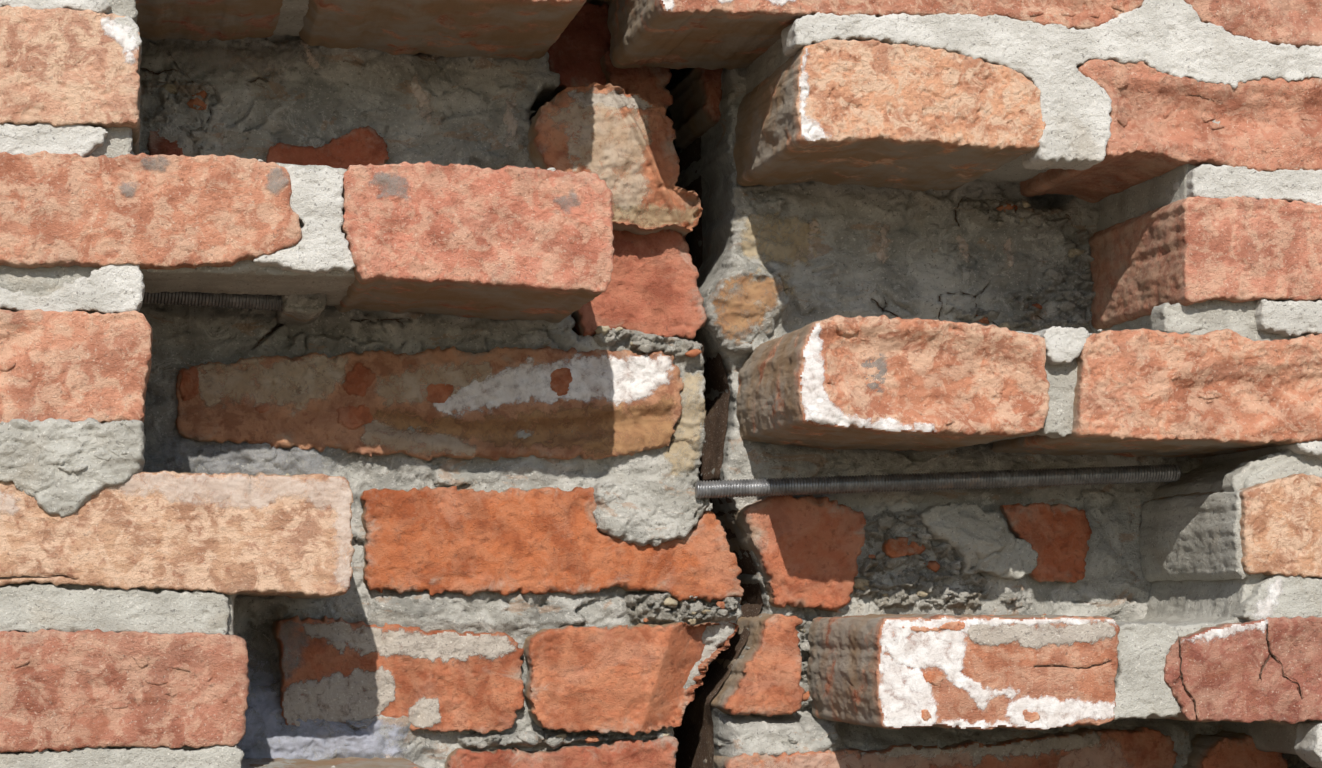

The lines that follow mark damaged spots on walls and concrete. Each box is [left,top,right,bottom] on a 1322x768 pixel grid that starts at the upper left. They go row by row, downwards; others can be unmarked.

crack [668,114,703,270]
spalling [951,198,1096,333]
peeling [550,367,573,396]
spalling [593,326,702,360]
crack [673,343,764,768]
spalling [852,502,1038,633]
spalling [624,591,738,625]
spalling [453,730,670,750]
peeling [922,670,944,687]
peeling [1023,709,1040,723]
crack [1179,638,1198,719]
crack [1259,620,1303,700]